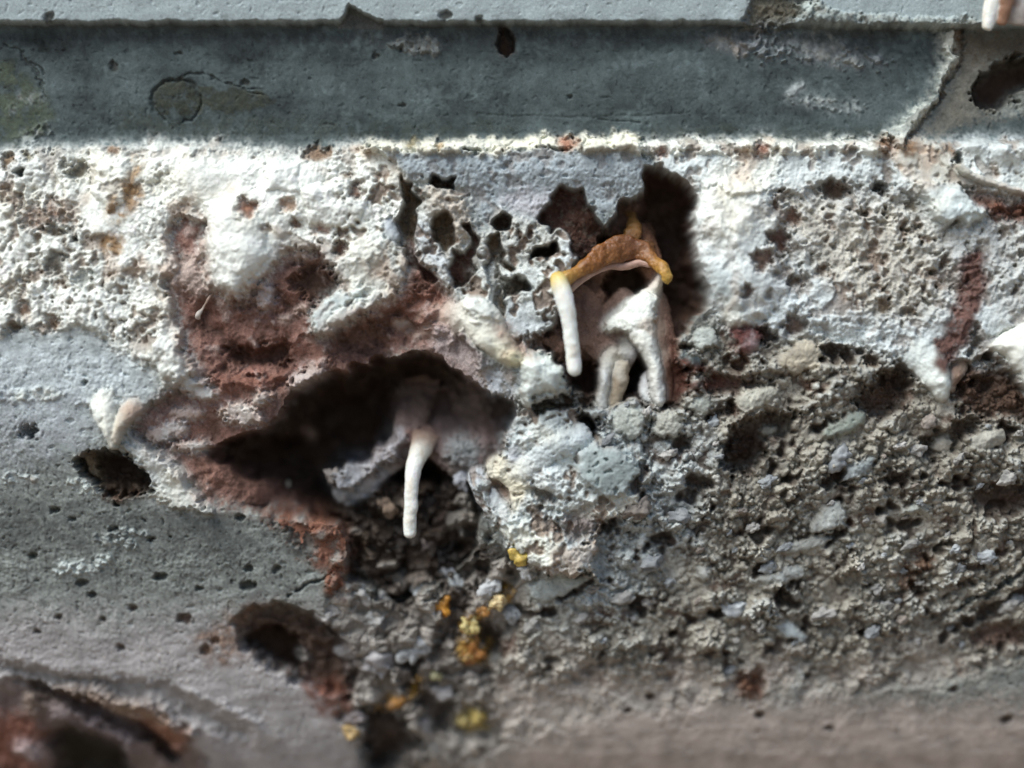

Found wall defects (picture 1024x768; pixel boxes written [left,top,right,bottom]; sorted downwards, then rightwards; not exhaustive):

crack [905,28,966,144]
spalling [970,55,1024,111]
water stain [0,63,1024,392]
rust [934,251,987,372]
spalling [75,449,156,507]
spalling [131,146,1024,768]
rust [268,508,351,595]